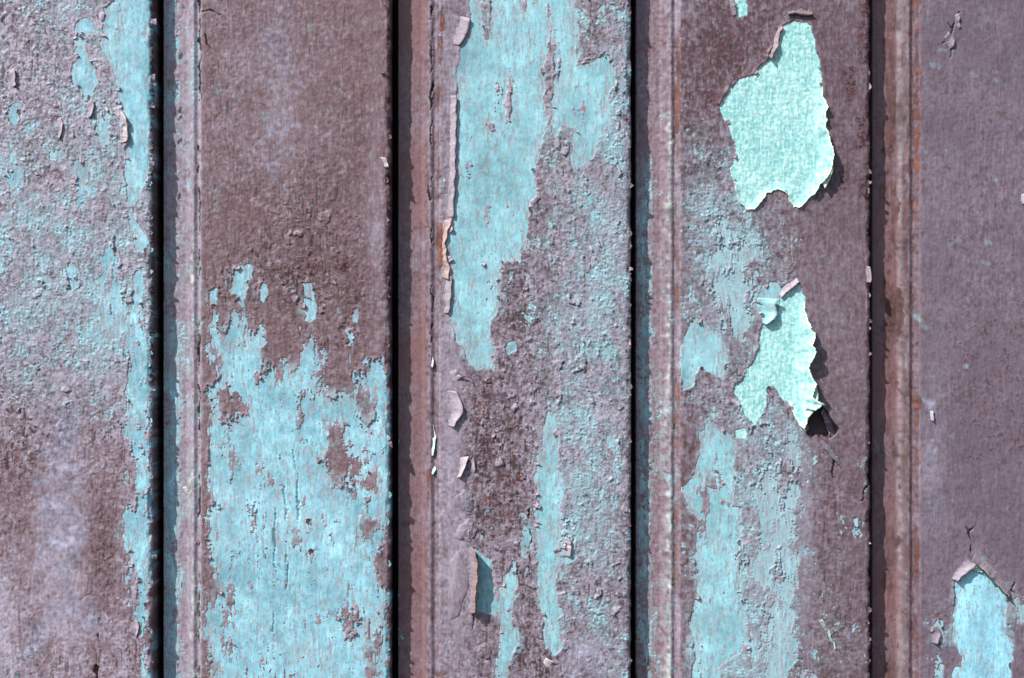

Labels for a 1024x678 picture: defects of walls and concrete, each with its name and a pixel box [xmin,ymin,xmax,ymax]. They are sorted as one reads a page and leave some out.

peeling [6,102,21,126]
peeling [42,254,80,291]
peeling [50,117,89,189]
peeling [71,0,181,253]
peeling [442,0,616,427]
peeling [719,8,834,209]
peeling [97,242,189,678]
peeling [195,264,404,678]
peeling [679,207,839,678]
peeling [930,554,1024,678]